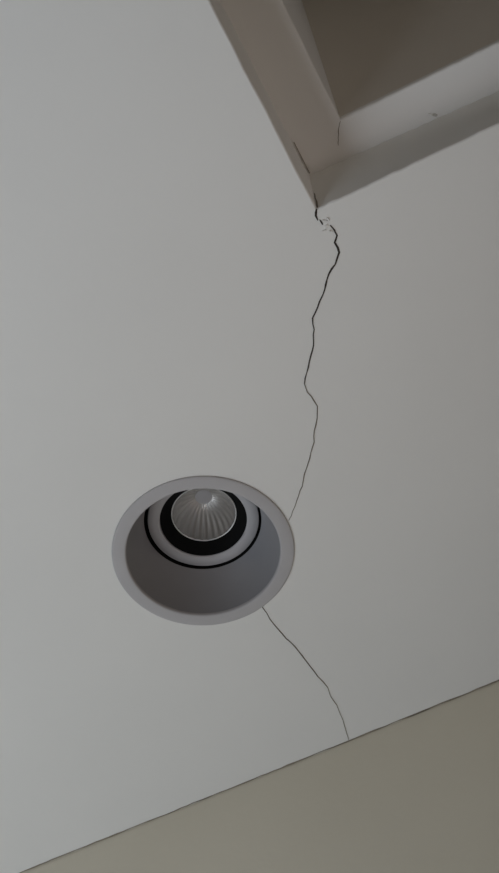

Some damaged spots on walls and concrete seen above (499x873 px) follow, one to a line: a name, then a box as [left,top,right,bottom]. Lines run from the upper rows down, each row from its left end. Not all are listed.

crack [289,193,340,520]